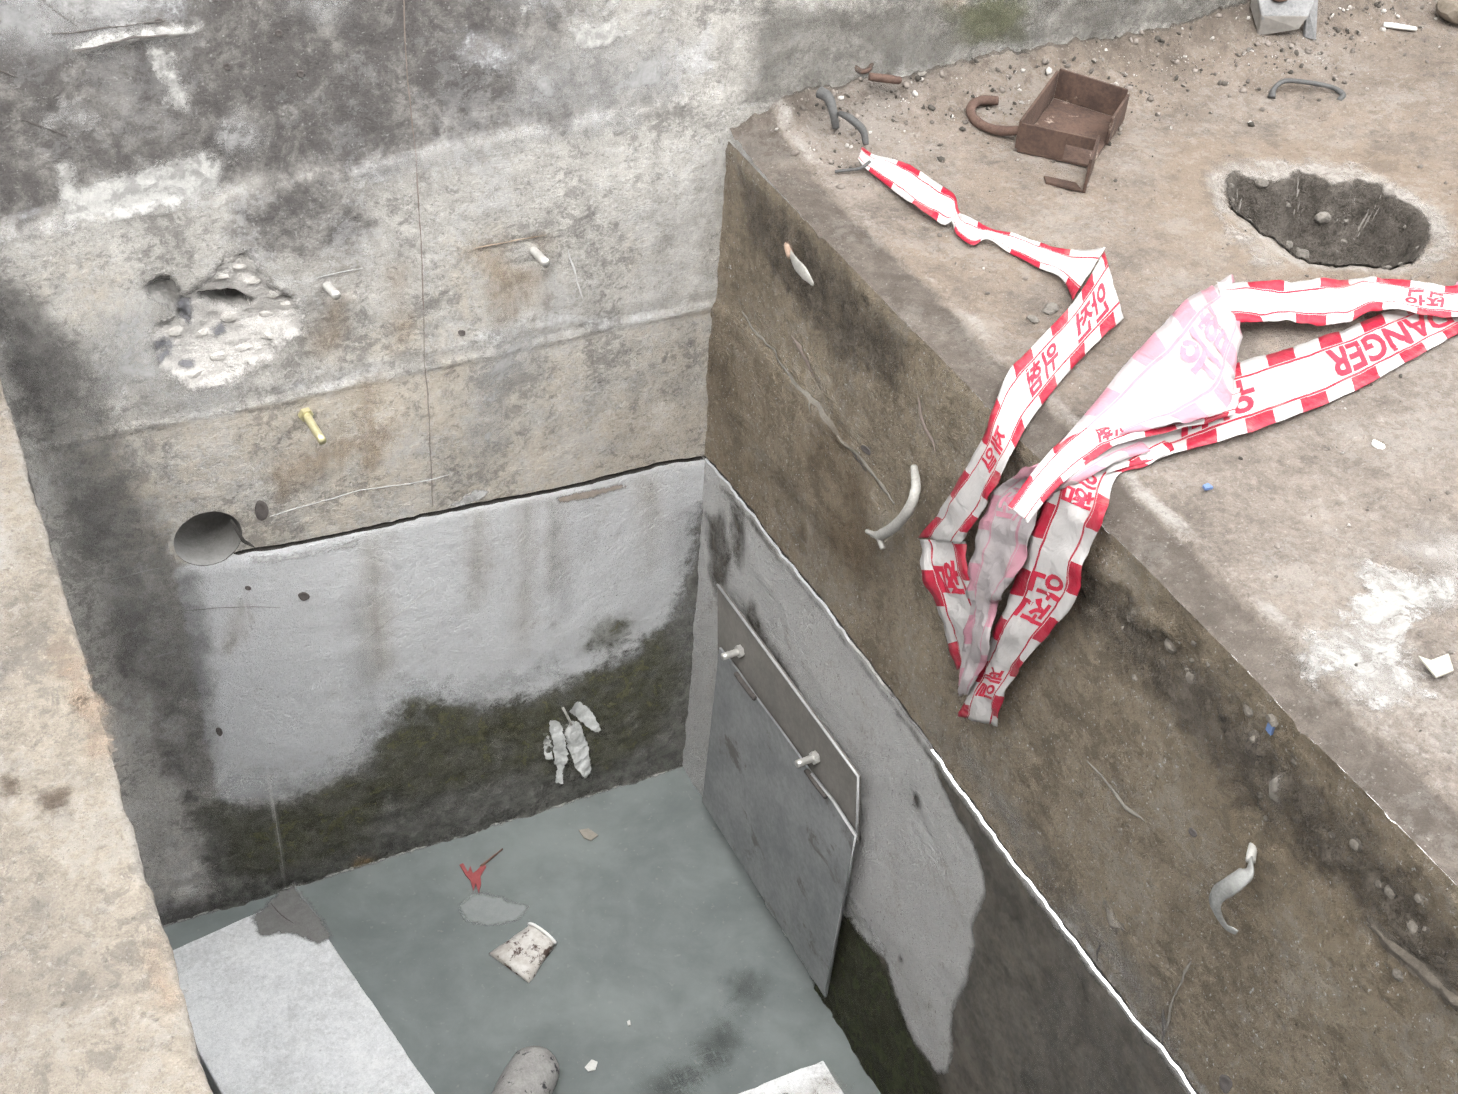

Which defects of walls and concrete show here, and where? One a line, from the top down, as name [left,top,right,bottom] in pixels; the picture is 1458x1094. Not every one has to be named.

peeling [0,0,163,40]
leakage [146,46,186,106]
leakage [758,0,1248,96]
leakage [57,123,254,229]
spalling [146,250,311,391]
leakage [747,606,792,681]
leakage [185,494,778,910]
leakage [841,728,1188,1094]